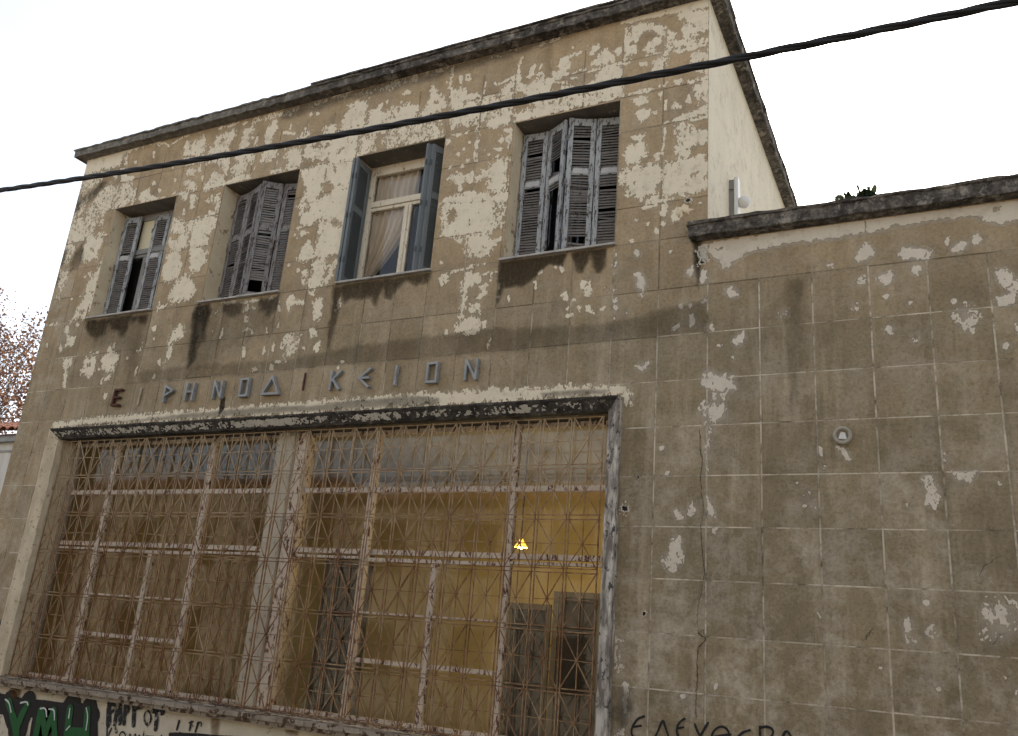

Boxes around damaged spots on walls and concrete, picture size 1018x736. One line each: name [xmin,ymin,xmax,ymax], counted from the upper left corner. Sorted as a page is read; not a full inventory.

peeling [46,0,709,400]
peeling [686,201,1018,284]
peeling [857,270,894,300]
leakage [189,304,210,364]
peeling [717,330,745,359]
peeling [951,299,983,334]
peeling [53,382,634,437]
peeling [697,372,737,472]
peeling [674,495,718,534]
peeling [921,475,941,510]
peeling [661,535,684,573]
peeling [976,595,1018,641]